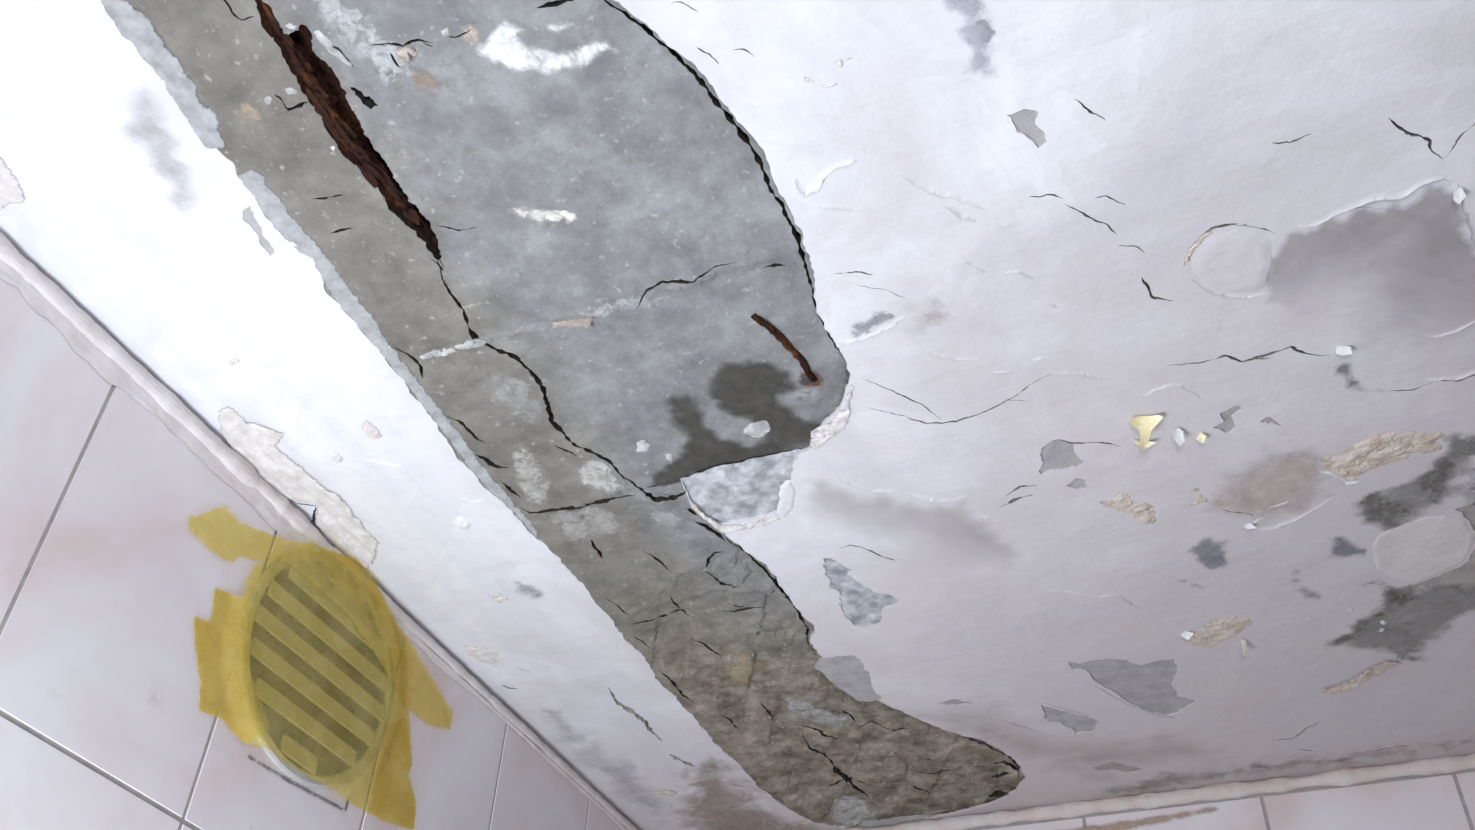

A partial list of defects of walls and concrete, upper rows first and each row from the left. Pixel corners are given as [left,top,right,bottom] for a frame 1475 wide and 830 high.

peeling [1009,109,1046,147]
crack [537,0,1050,424]
crack [1029,194,1170,301]
spalling [102,0,1025,828]
crack [382,197,816,655]
leakage [654,363,821,485]
peeling [1128,405,1241,450]
leakage [1361,437,1475,527]
leakage [1334,538,1365,555]
leakage [1335,586,1475,659]
crack [607,551,1020,807]
peeling [1069,658,1194,718]